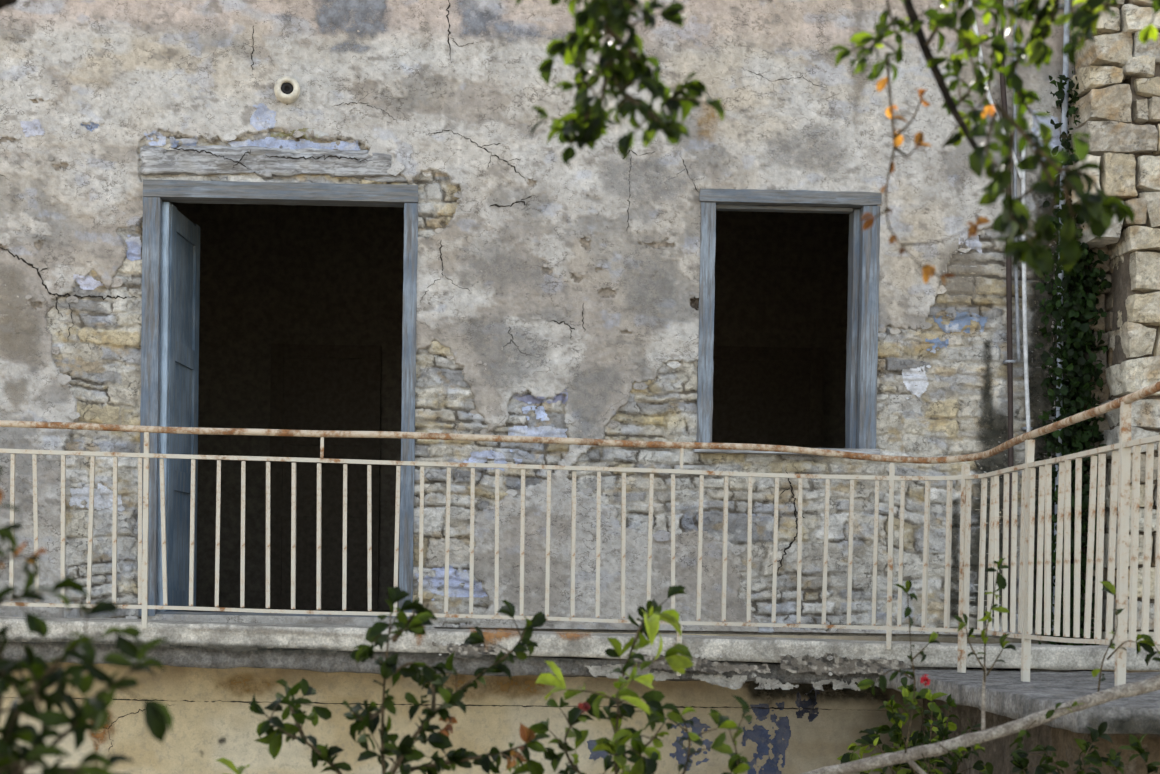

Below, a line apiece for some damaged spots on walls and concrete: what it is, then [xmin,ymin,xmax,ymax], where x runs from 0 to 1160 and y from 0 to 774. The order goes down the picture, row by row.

damp [317,0,387,52]
crack [446,0,474,63]
damp [457,0,538,36]
flaking render [137,103,461,239]
crack [429,130,532,207]
crack [0,247,137,337]
flaking render [25,221,143,619]
flaking render [412,220,1051,636]
crack [769,472,805,573]
spalling [432,641,506,660]
spalling [585,653,911,774]